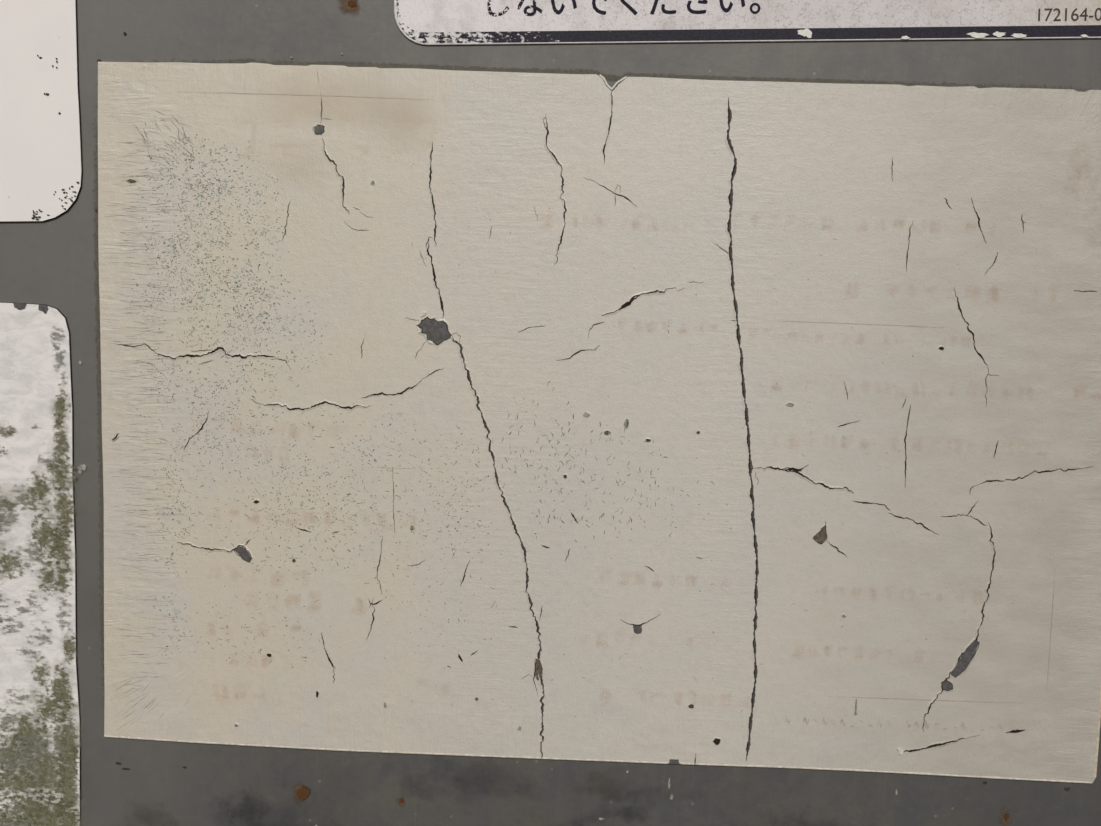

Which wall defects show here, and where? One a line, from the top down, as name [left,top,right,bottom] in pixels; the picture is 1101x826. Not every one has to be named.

rust [340,0,358,12]